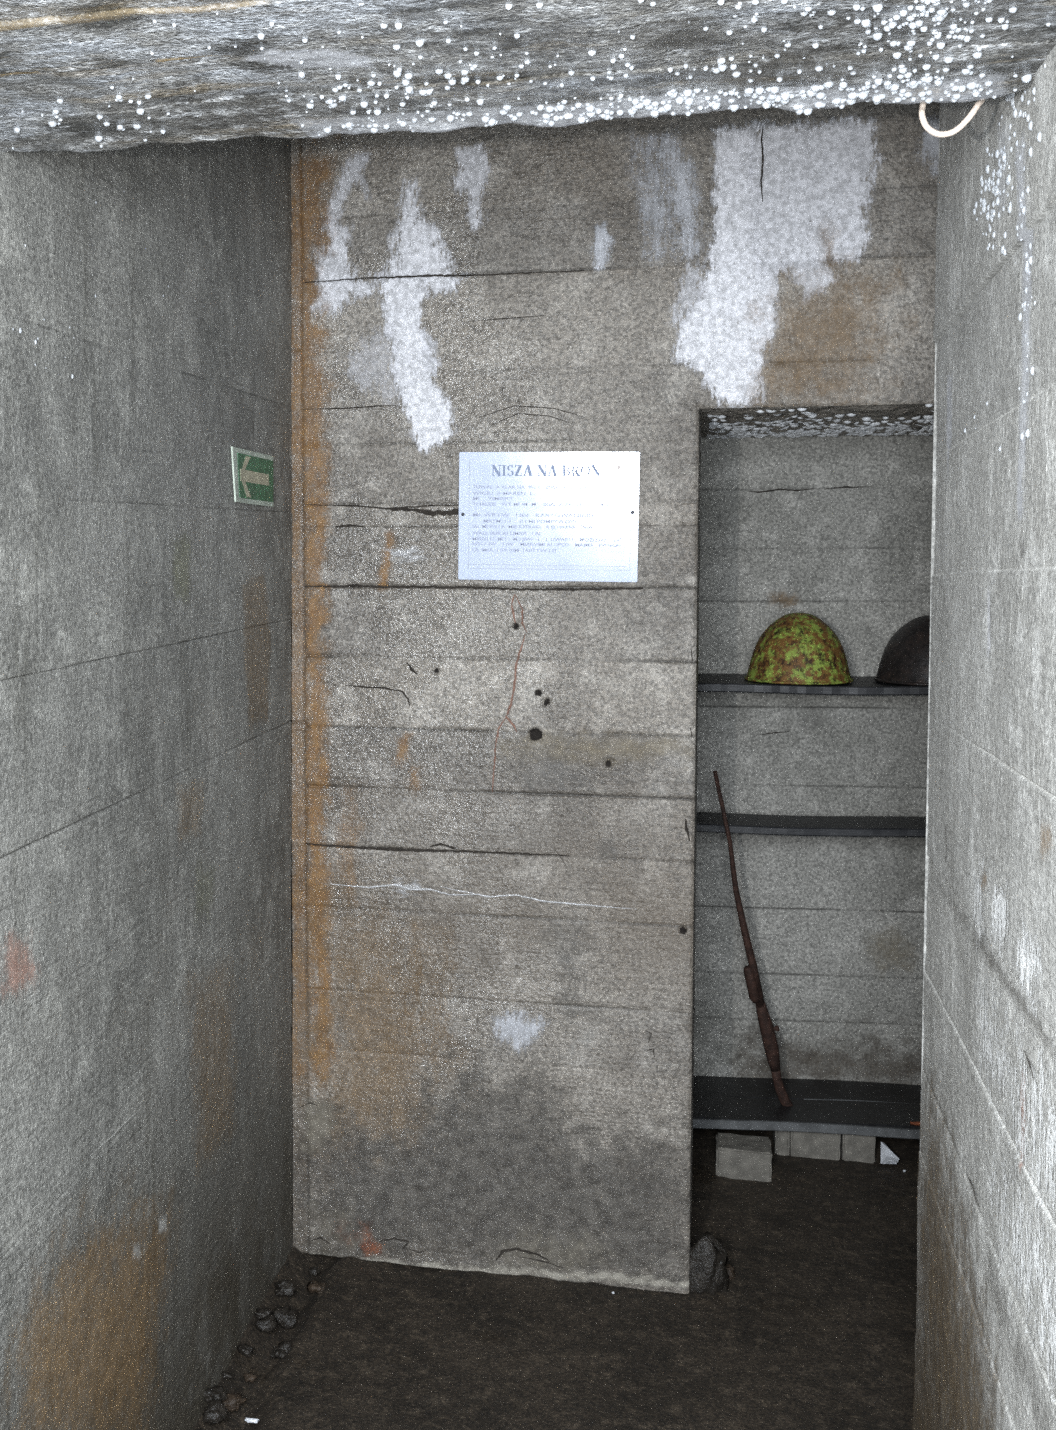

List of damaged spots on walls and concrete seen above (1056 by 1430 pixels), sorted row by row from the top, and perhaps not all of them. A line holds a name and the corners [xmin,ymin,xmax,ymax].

damp [310,152,463,455]
damp [453,143,490,230]
damp [633,115,882,408]
crack [304,584,643,792]